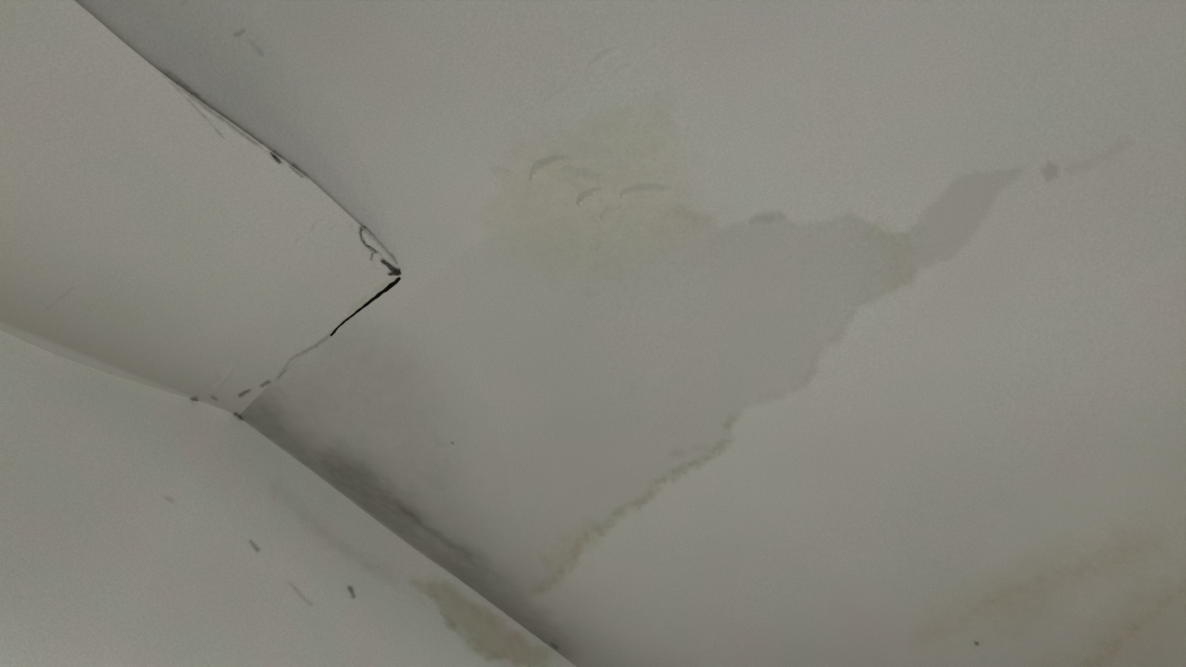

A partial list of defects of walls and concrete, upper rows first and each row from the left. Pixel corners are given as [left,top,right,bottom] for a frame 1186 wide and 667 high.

crack [330,227,401,337]